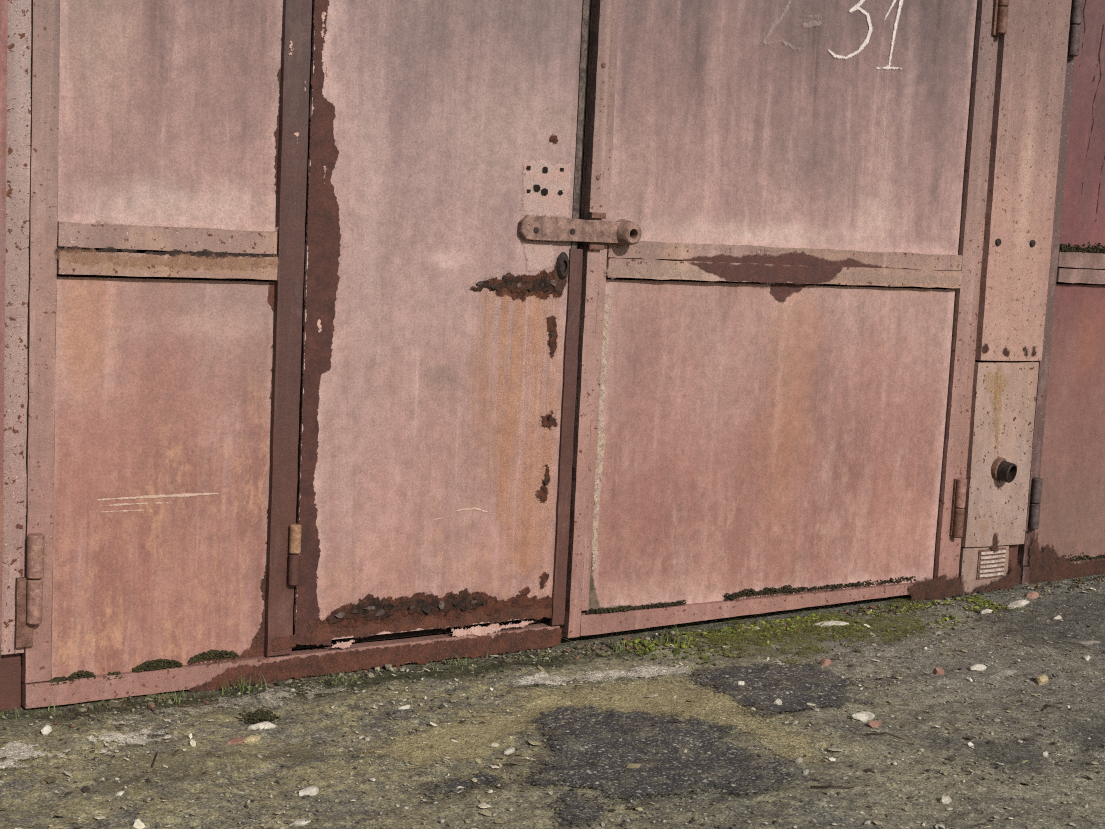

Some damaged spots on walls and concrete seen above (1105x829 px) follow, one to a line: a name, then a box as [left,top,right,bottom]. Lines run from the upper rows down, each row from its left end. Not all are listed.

crack [1082,0,1105,220]
corrosion [471,263,569,302]
corrosion [316,588,552,629]